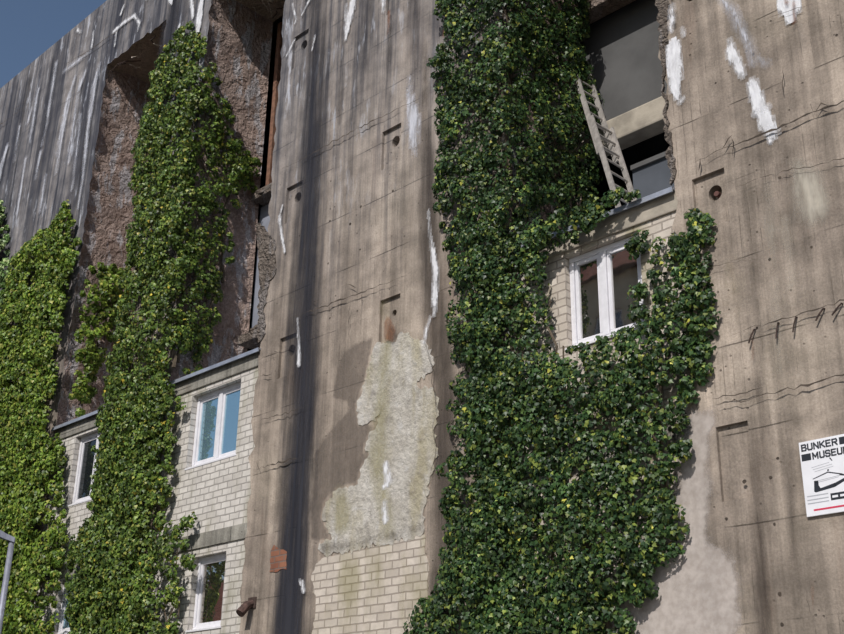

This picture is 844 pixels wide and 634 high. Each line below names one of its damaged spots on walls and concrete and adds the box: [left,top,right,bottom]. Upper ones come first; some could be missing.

spalling [655,0,677,186]
crack [695,100,844,169]
damp [272,0,371,634]
flaking render [311,332,440,634]
crack [710,374,844,407]
crack [736,299,844,334]